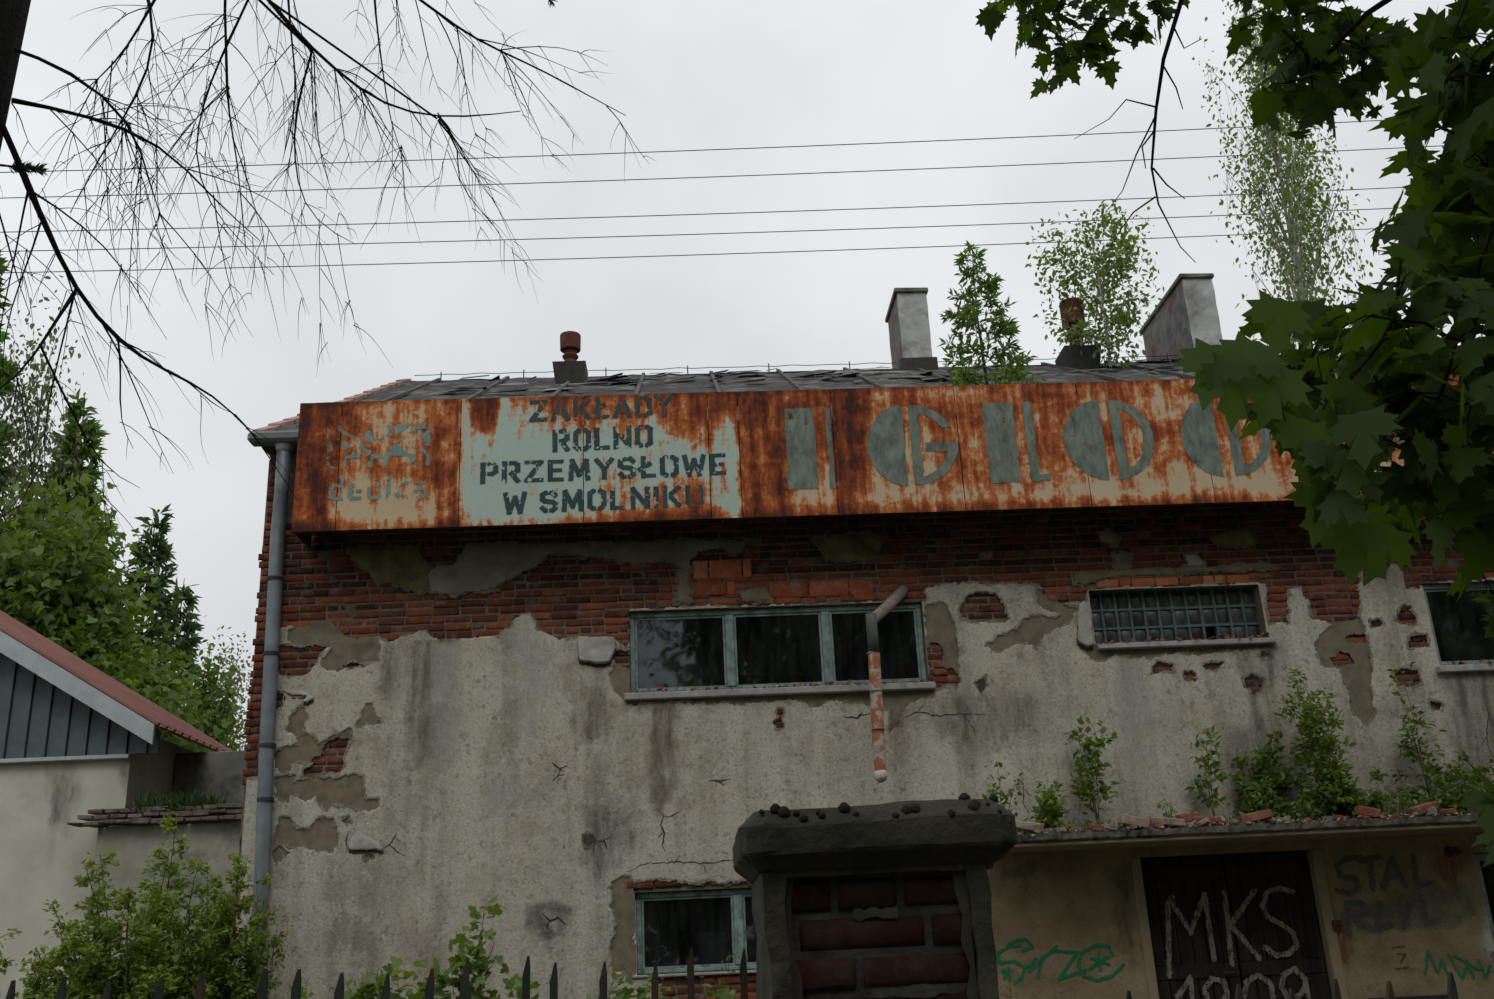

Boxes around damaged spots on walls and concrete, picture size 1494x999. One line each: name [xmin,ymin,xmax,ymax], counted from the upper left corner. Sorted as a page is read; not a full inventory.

spalling [67,803,243,828]
spalling [242,494,1465,865]